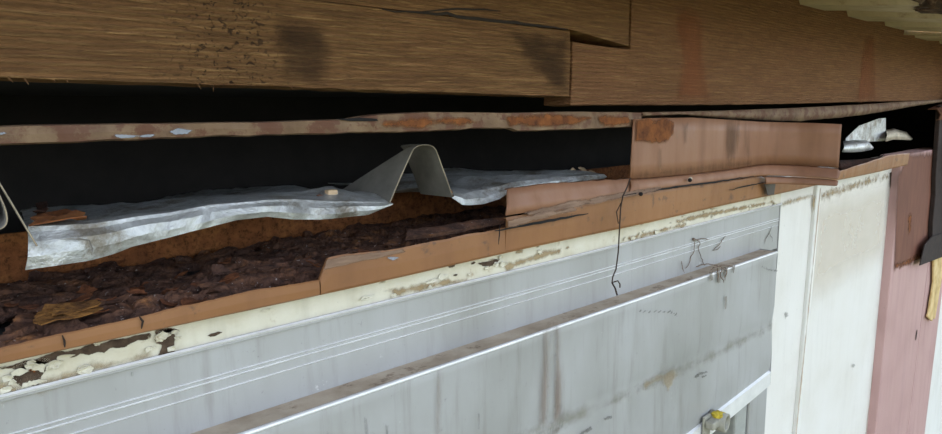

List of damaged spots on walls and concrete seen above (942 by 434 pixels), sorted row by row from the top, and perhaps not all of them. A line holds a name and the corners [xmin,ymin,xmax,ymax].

crack [382,8,568,30]
corrosion [507,114,674,143]
peeling [508,187,662,227]
peeling [624,201,777,241]
peeling [325,249,405,269]
peeling [391,246,569,298]
peeling [0,328,182,395]